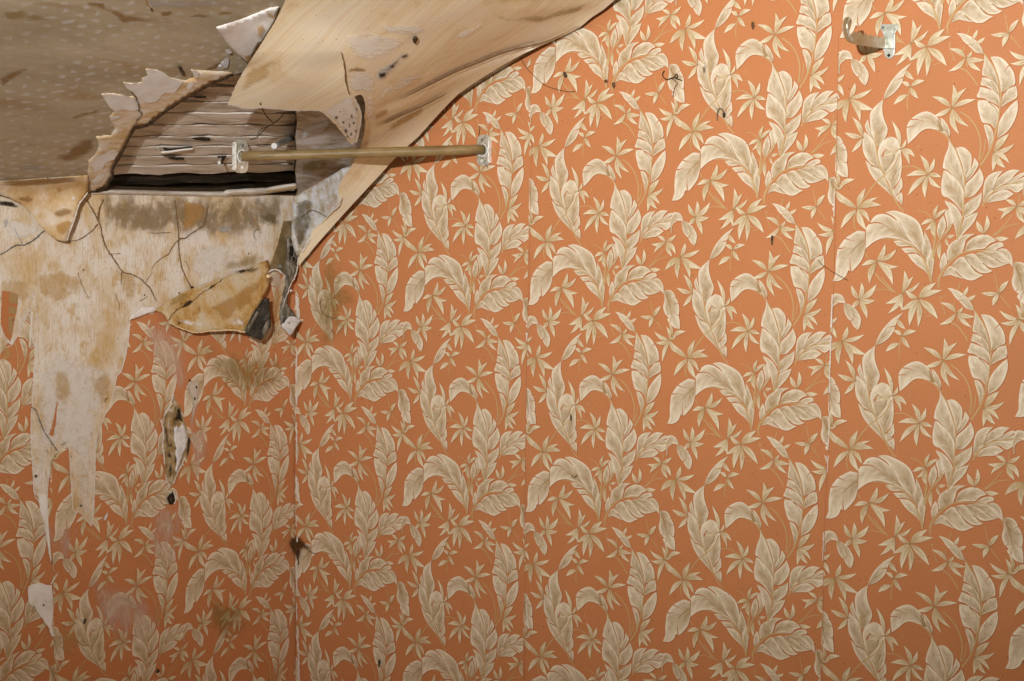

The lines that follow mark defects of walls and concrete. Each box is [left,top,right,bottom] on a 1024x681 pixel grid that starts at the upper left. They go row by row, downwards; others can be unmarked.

flaking render [163,137,210,160]
crack [0,230,45,255]
crack [69,74,234,308]
water stain [183,204,203,230]
water stain [279,237,301,336]
peeling [0,175,294,563]
peeling [28,577,56,637]